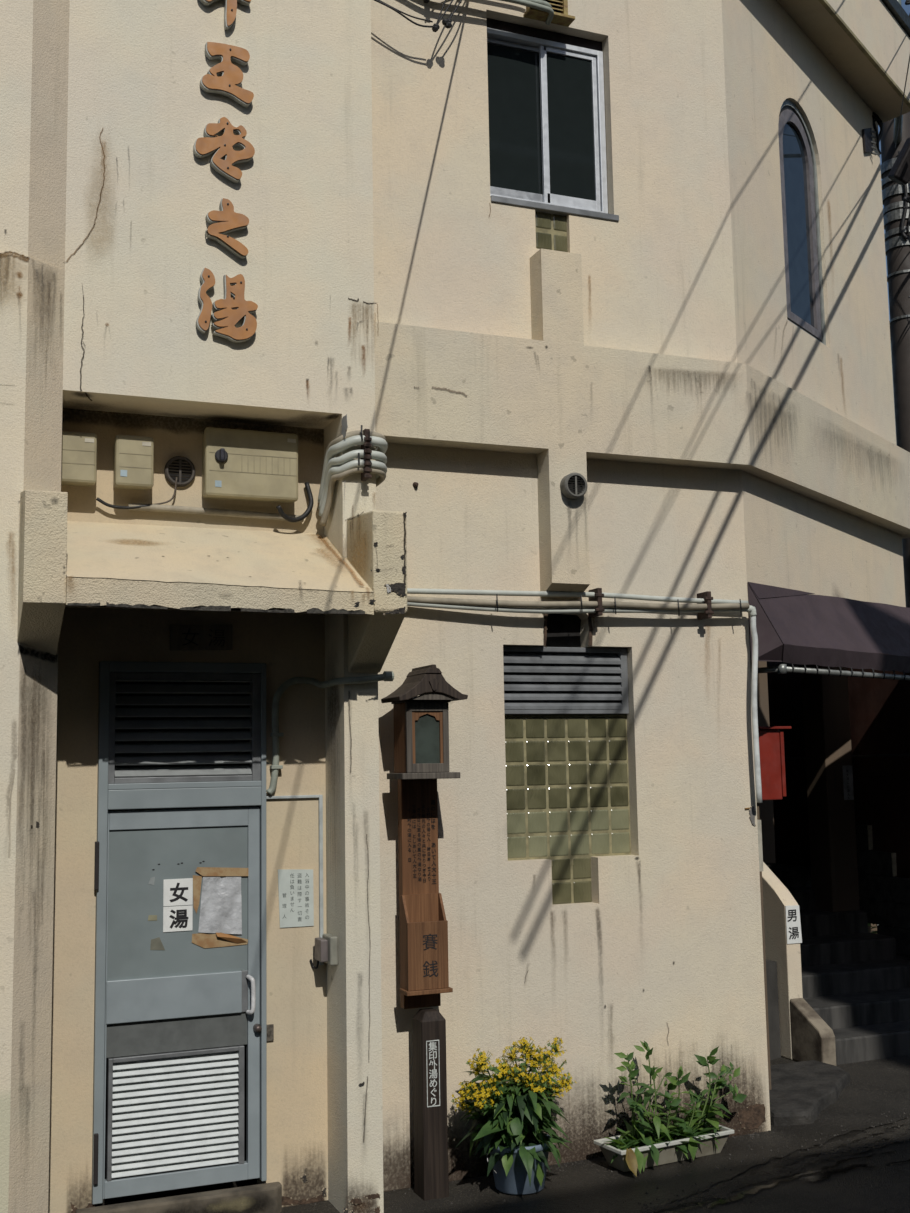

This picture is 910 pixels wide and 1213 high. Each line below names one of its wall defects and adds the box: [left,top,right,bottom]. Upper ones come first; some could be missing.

crack [0,251,30,262]
crack [66,129,105,391]
spalling [371,542,407,616]
peeling [67,602,365,614]
leakage [543,1075,763,1165]
leakage [383,1142,414,1192]
leakage [447,1130,493,1181]